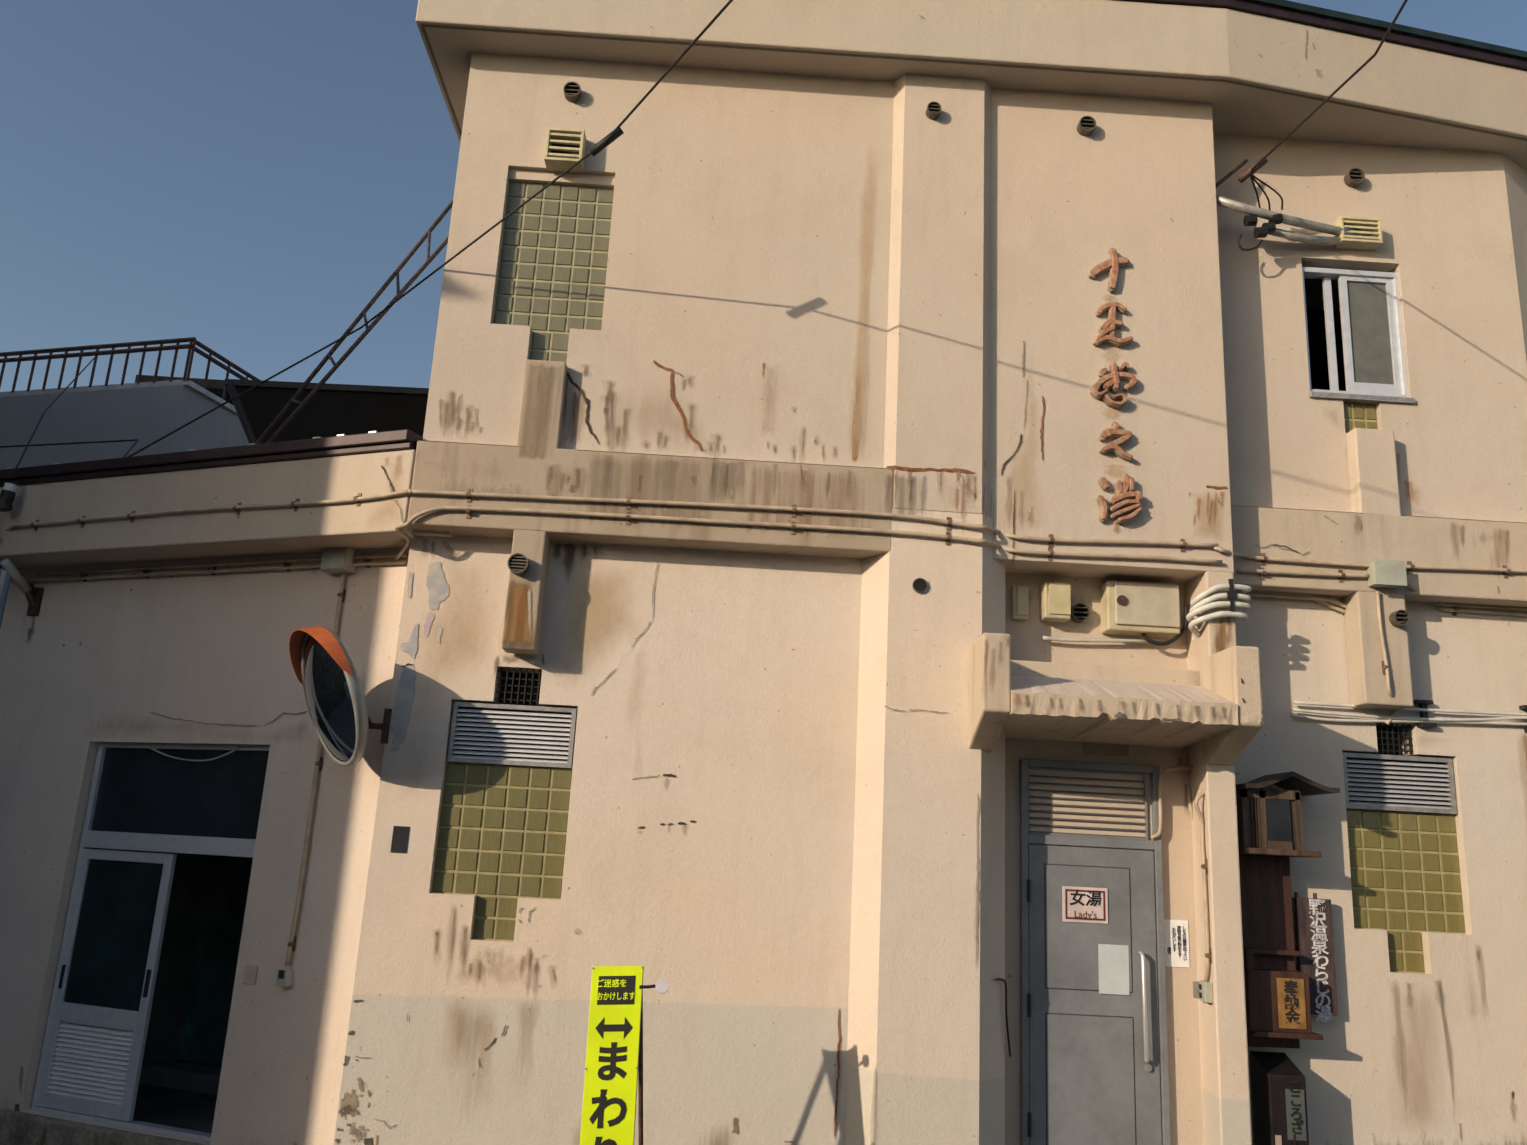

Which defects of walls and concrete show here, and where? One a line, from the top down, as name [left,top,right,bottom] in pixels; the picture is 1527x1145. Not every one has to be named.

crack [567,372,599,444]
crack [653,361,703,451]
damp [852,304,865,460]
peeling [391,562,449,751]
crack [151,711,307,727]
spalling [335,1030,396,1145]